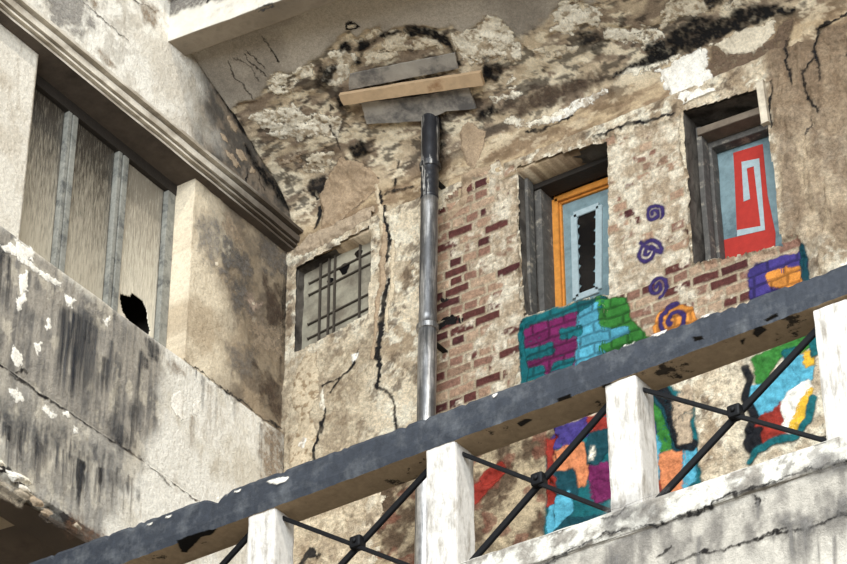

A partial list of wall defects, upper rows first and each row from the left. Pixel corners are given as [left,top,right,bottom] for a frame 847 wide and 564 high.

peeling [248,14,523,142]
peeling [549,0,711,51]
leakage [507,0,796,117]
peeling [613,19,793,105]
crack [768,12,847,135]
leakage [308,177,326,196]
leakage [349,140,369,158]
flaking render [593,115,801,337]
leakage [58,308,113,384]
crack [312,161,414,460]
crack [0,364,199,501]
crack [546,459,847,564]